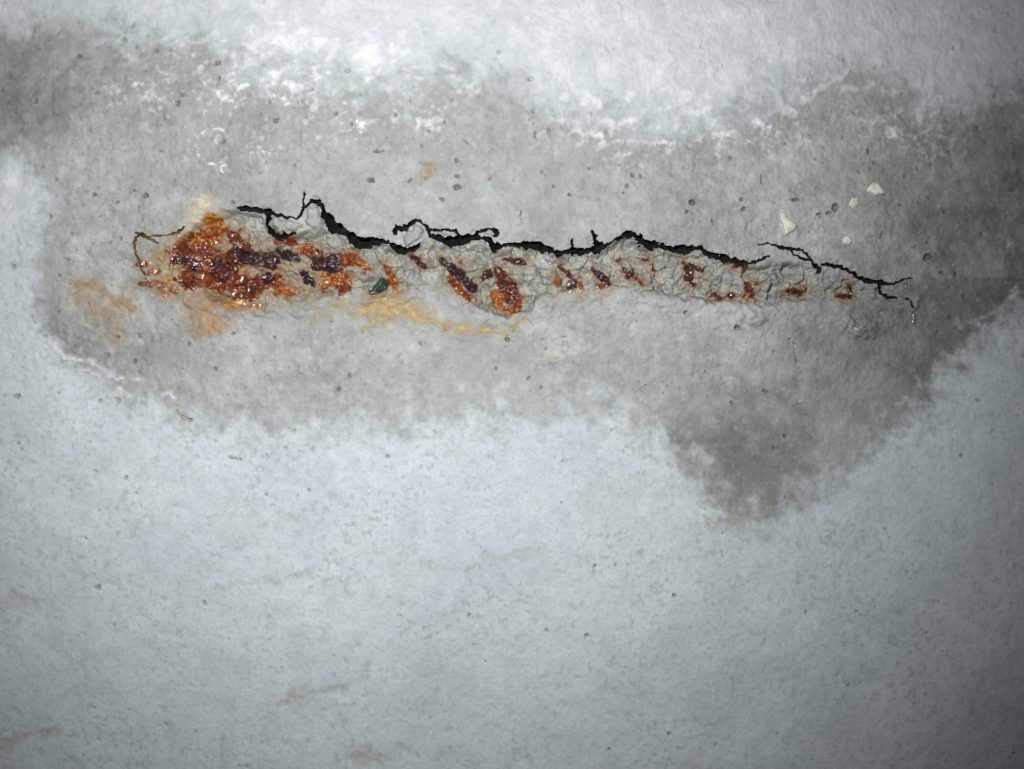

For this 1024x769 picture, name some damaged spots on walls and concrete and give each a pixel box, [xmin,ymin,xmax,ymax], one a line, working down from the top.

rust [135,196,527,335]
water stain [0,0,1024,517]
rust [554,264,583,292]
crack [237,192,915,309]
rust [590,266,611,289]
rust [615,258,656,286]
rust [681,261,704,287]
rust [711,264,756,300]
rust [784,286,807,297]
rust [834,282,853,299]